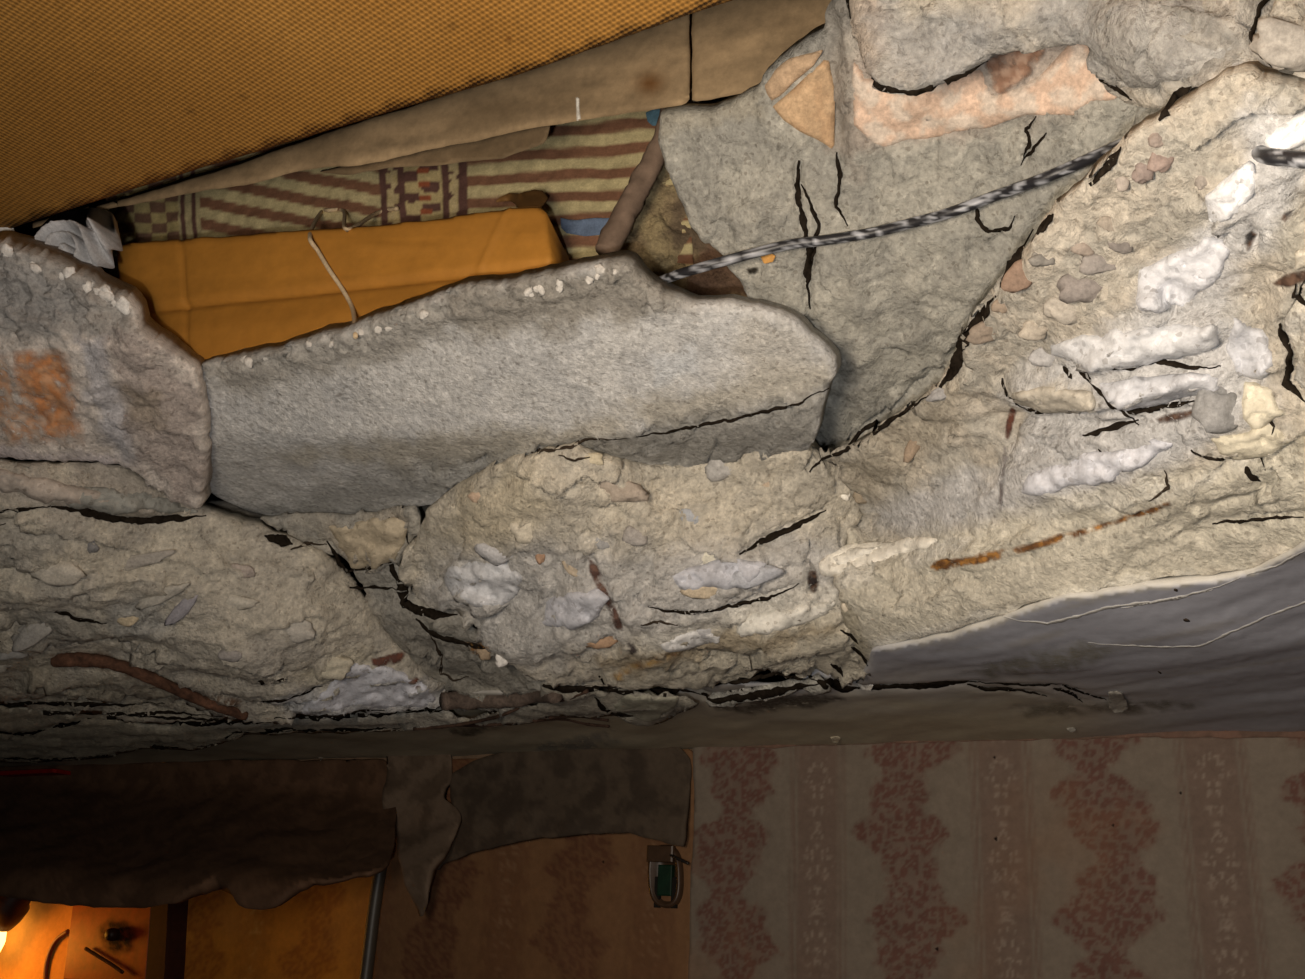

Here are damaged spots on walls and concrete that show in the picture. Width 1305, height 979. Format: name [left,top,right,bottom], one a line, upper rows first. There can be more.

crack [871,61,988,96]
crack [1158,86,1192,121]
crack [1089,147,1121,186]
crack [794,152,848,309]
spalling [0,0,1305,763]
crack [809,209,1054,473]
crack [1001,359,1221,472]
crack [1278,284,1305,402]
corrosion [931,503,1169,570]
corrosion [50,652,249,721]
crack [0,517,489,762]
crack [542,629,1106,718]